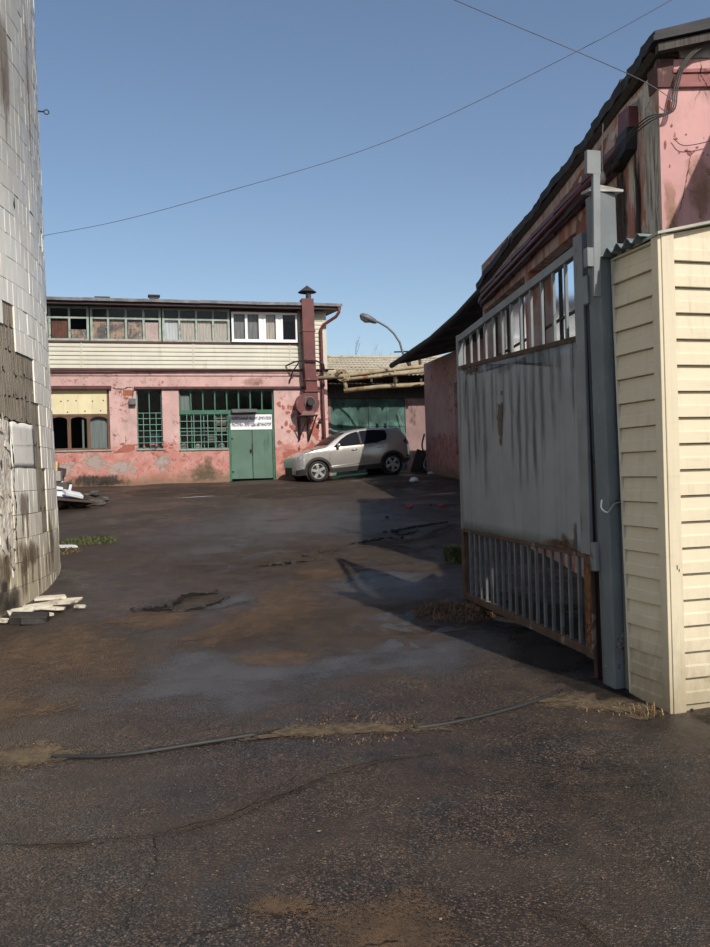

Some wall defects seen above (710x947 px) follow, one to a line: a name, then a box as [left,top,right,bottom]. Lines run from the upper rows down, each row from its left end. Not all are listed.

spalling [0,301,47,592]
flaking render [60,443,173,475]
peeling [277,402,323,471]
damp [0,494,54,617]
rust [583,564,592,646]
crack [0,753,434,930]
crack [363,939,397,947]